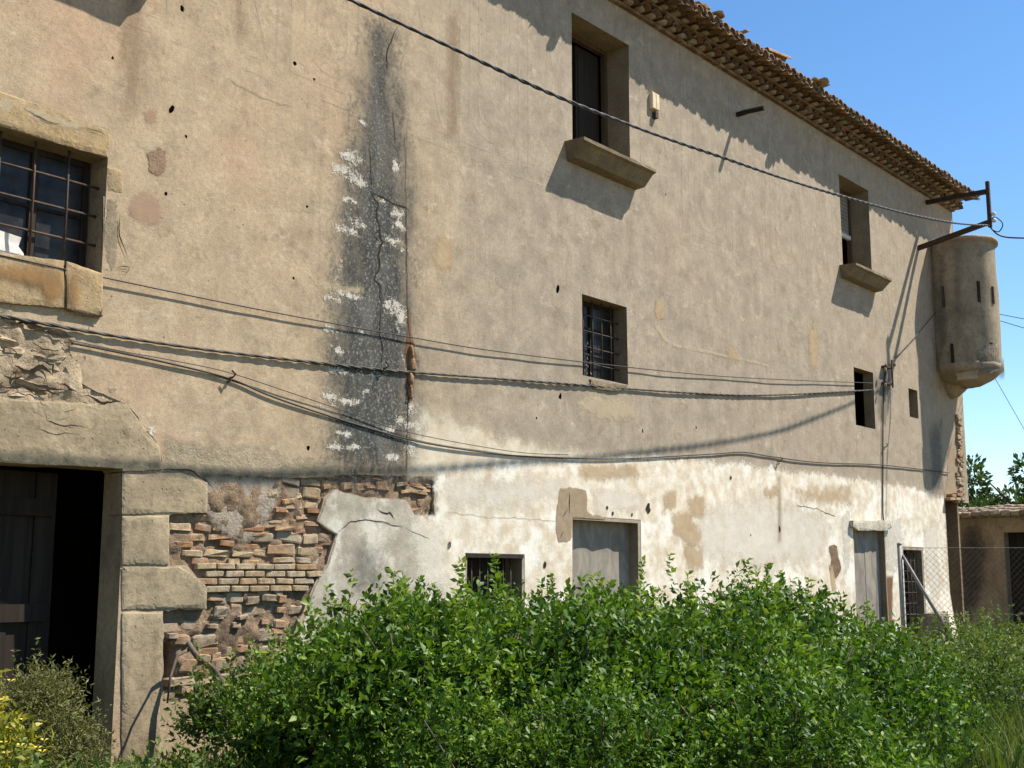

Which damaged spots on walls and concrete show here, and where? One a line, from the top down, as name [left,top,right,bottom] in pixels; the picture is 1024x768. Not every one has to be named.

damp [162,465,197,474]
damp [276,25,429,485]
crack [324,510,427,538]
crack [369,110,411,366]
rust [405,312,417,403]
peeling [162,414,967,703]